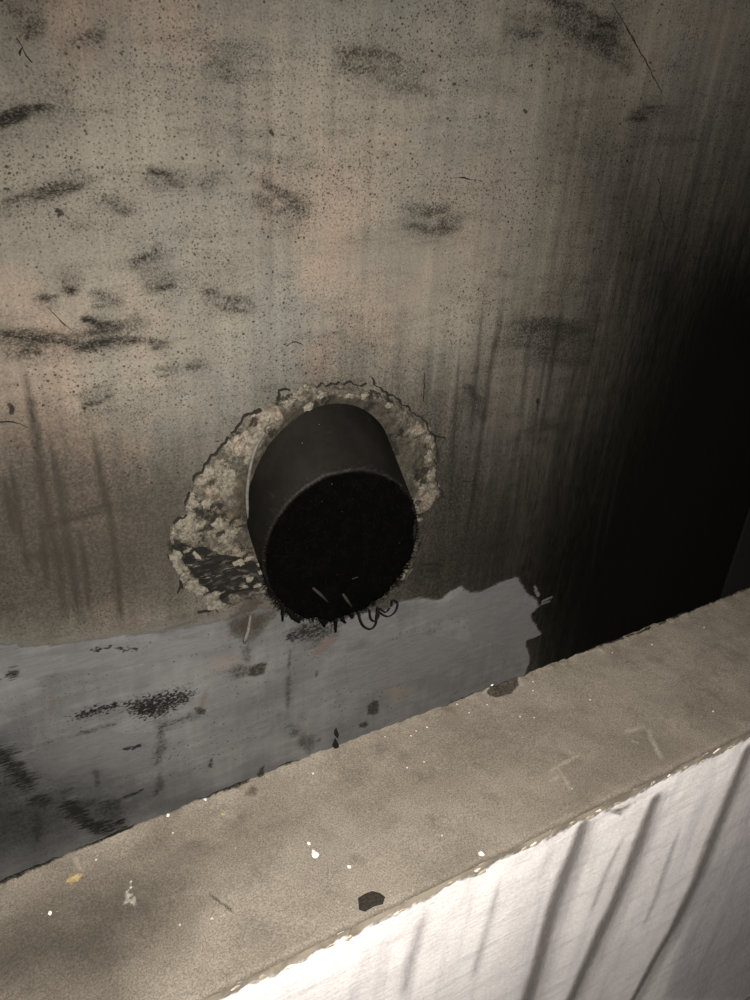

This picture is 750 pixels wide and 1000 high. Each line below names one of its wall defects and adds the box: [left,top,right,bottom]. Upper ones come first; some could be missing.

crack [612,4,662,92]
peeling [281,384,327,412]
peeling [415,430,437,499]
peeling [185,498,238,535]
spalling [167,543,266,614]